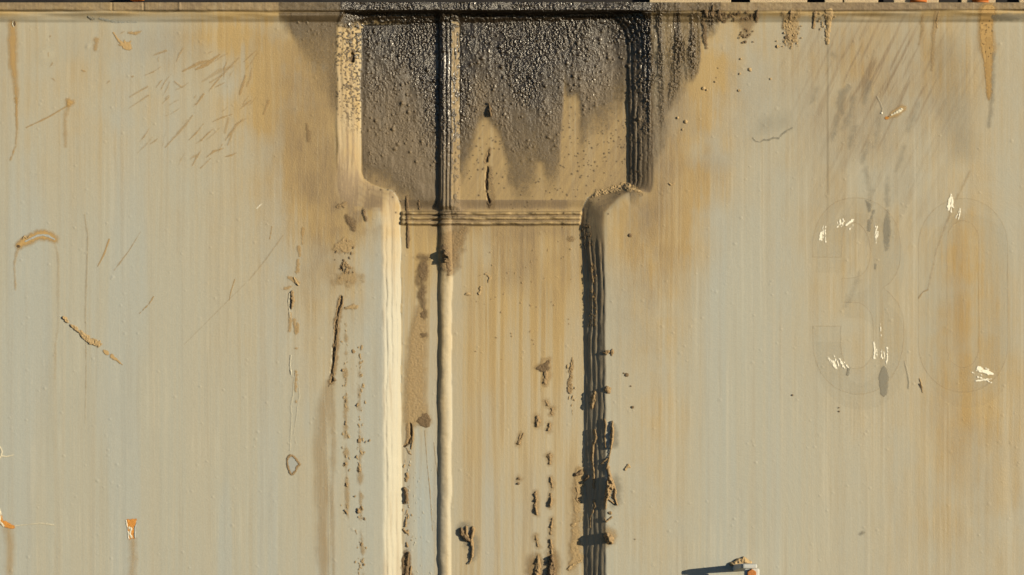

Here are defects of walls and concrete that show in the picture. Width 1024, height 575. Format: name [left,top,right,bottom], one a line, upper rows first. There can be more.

corrosion [979,4,995,100]
water stain [361,13,719,248]
peeling [62,316,123,365]
crack [329,296,344,385]
peeling [972,366,994,383]